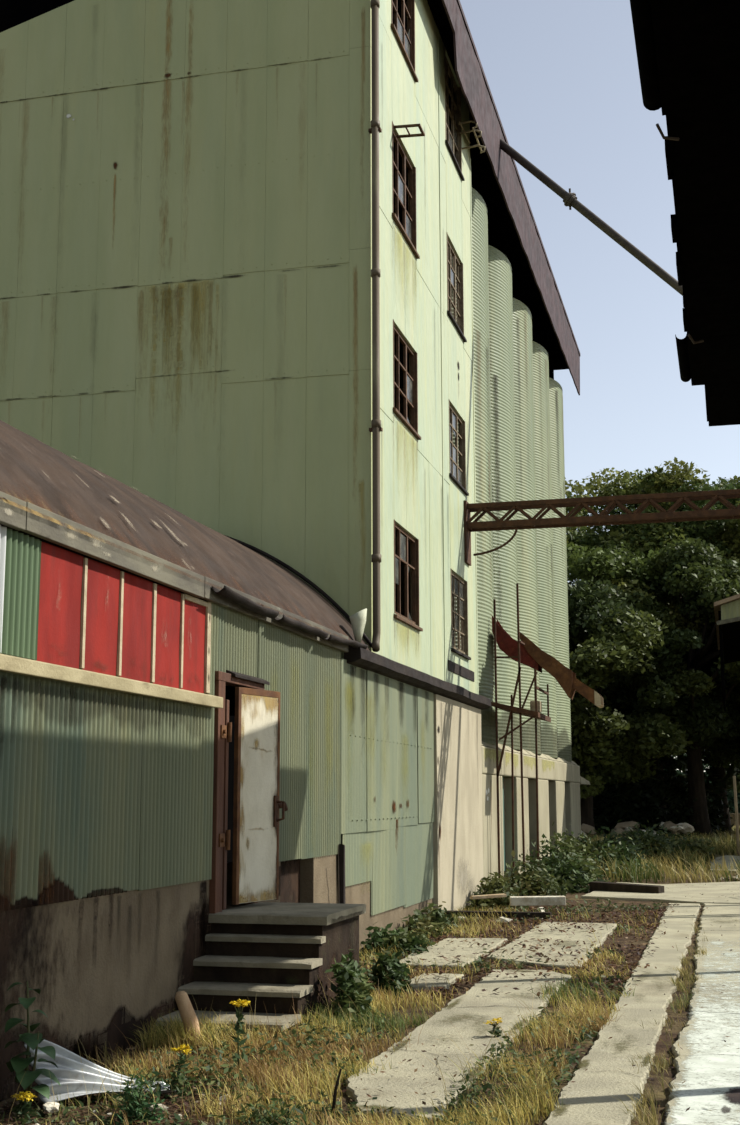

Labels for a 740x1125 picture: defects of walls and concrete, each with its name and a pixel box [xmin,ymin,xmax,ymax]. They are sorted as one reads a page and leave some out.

rust [153,280,208,376]
rust [0,879,127,912]
leakage [0,881,211,1102]